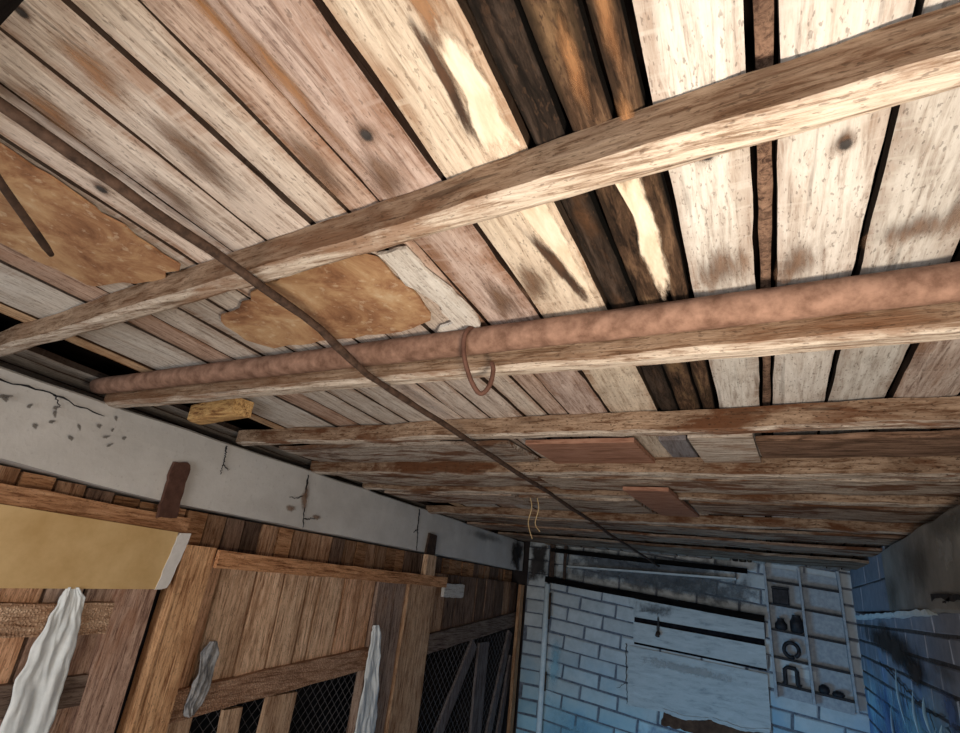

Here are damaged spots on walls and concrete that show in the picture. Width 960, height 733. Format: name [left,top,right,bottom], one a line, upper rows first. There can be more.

crack [0,378,103,416]
crack [292,475,314,527]
crack [930,593,960,604]